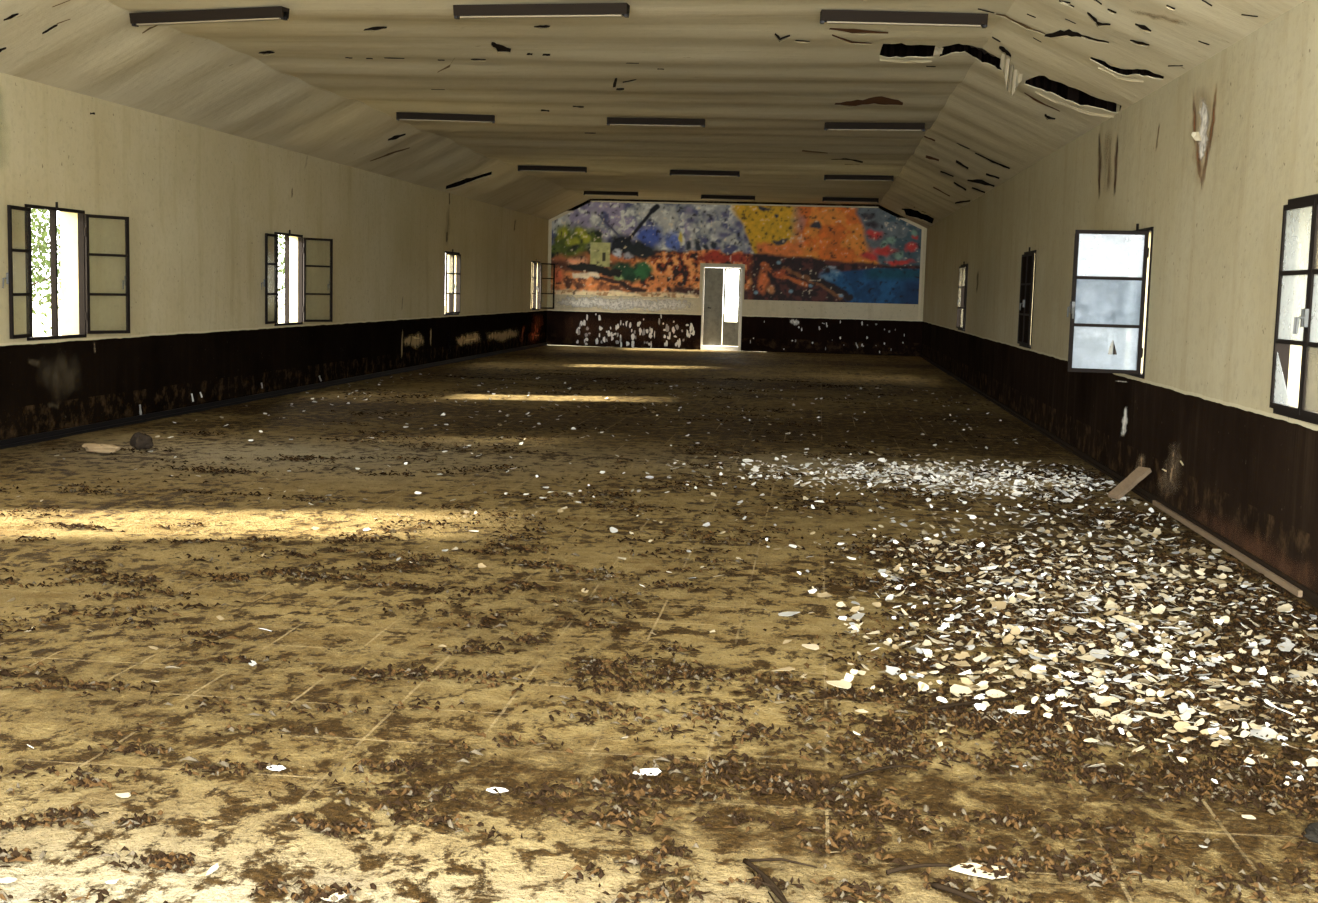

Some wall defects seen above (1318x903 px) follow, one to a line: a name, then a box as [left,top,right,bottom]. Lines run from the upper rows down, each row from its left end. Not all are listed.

peeling [1059,0,1116,27]
peeling [1130,14,1151,47]
spalling [1090,57,1164,79]
spalling [1025,76,1121,112]
spalling [561,296,695,348]